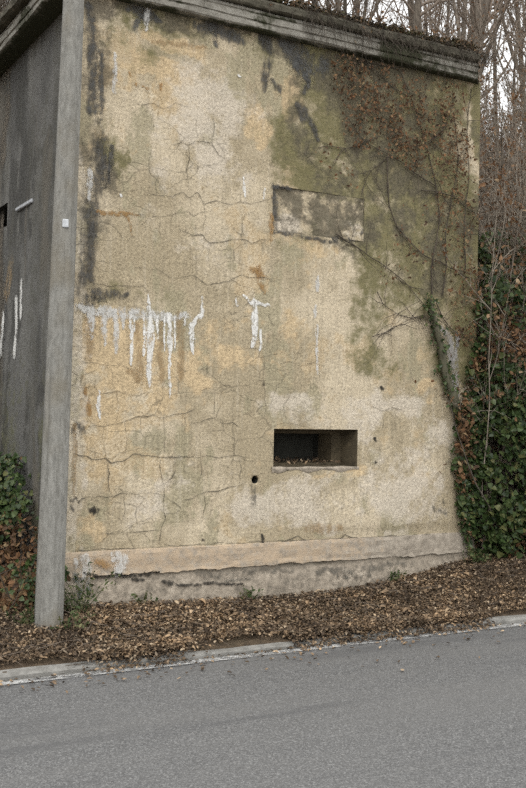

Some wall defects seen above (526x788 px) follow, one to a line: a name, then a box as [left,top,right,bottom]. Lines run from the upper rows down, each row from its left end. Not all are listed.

damp [85,2,118,120]
damp [258,34,329,94]
damp [295,102,320,142]
damp [78,132,129,306]
crack [87,119,272,305]
damp [272,185,363,243]
damp [13,280,22,358]
damp [129,294,204,397]
crack [74,361,445,551]